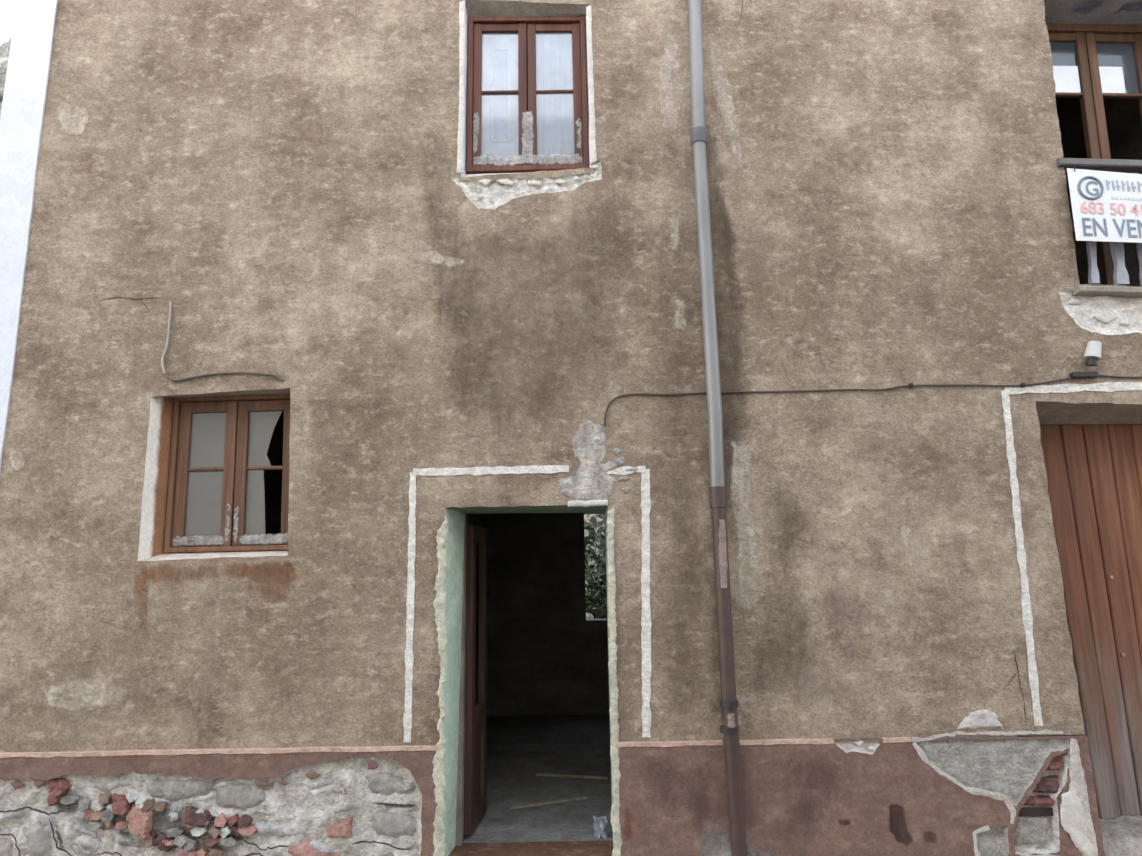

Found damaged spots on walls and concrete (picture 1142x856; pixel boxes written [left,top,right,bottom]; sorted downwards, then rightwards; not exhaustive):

peeling [452,1,602,210]
peeling [1058,289,1142,335]
peeling [172,504,288,546]
corrosion [135,563,296,613]
flaking render [0,516,448,856]
peeling [567,499,623,856]
peeling [835,741,880,754]
peeling [912,730,1098,856]
flaking render [700,834,731,856]
damp [889,804,911,843]